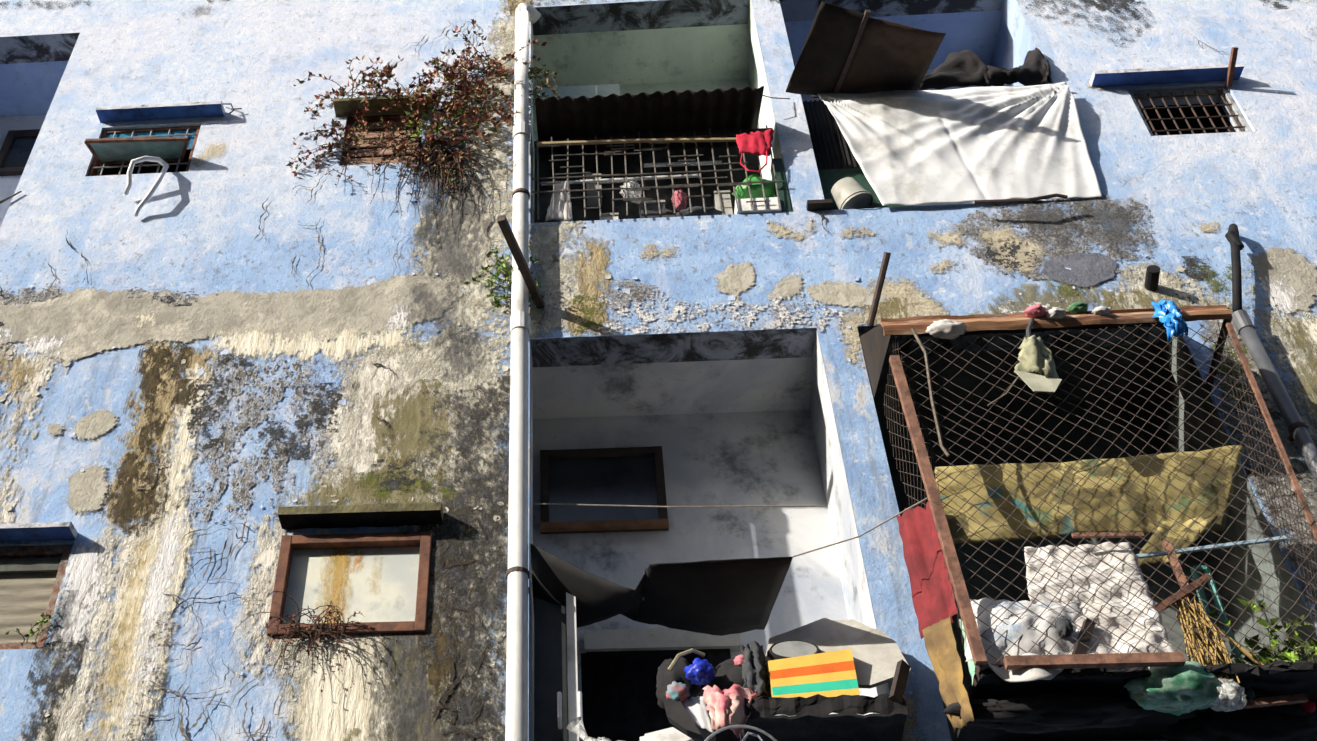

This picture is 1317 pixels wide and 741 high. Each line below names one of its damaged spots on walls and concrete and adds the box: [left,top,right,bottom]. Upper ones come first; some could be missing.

spalling [0,283,66,305]
peeling [0,339,71,524]
spalling [126,286,197,306]
peeling [175,0,540,741]
peeling [528,218,955,369]
peeling [928,224,968,273]
water stain [949,195,1155,280]
peeling [1100,261,1317,619]
water stain [32,339,218,741]
crack [139,520,290,741]